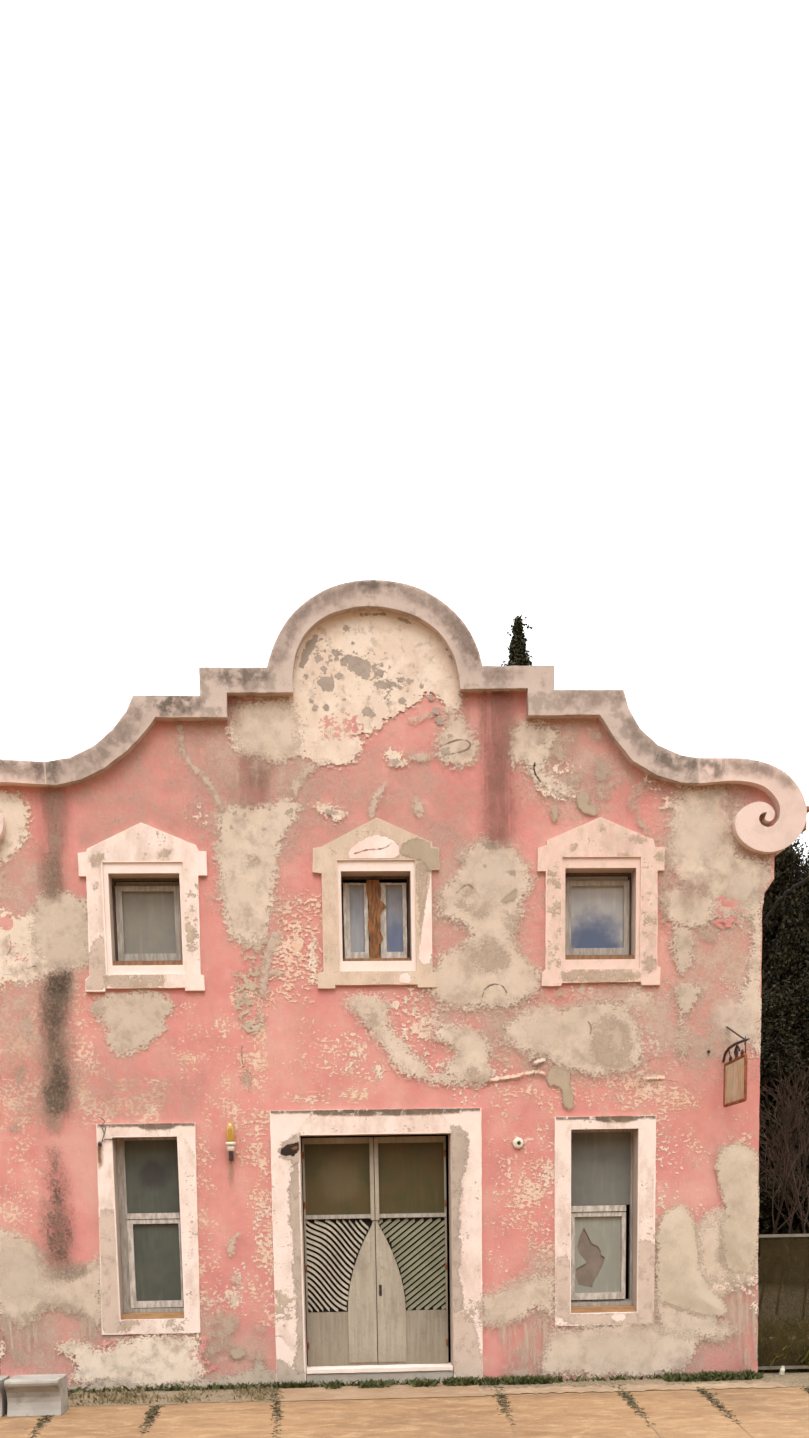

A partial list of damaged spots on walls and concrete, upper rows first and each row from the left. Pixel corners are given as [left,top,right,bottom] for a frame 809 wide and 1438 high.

leakage [219,581,478,681]
spalling [299,612,453,755]
peeling [87,851,114,889]
peeling [185,869,199,963]
peeling [196,707,316,862]
peeling [327,822,399,859]
leakage [42,972,71,1129]
peeling [387,718,769,1380]
peeling [0,888,403,1384]
leakage [42,1150,78,1277]